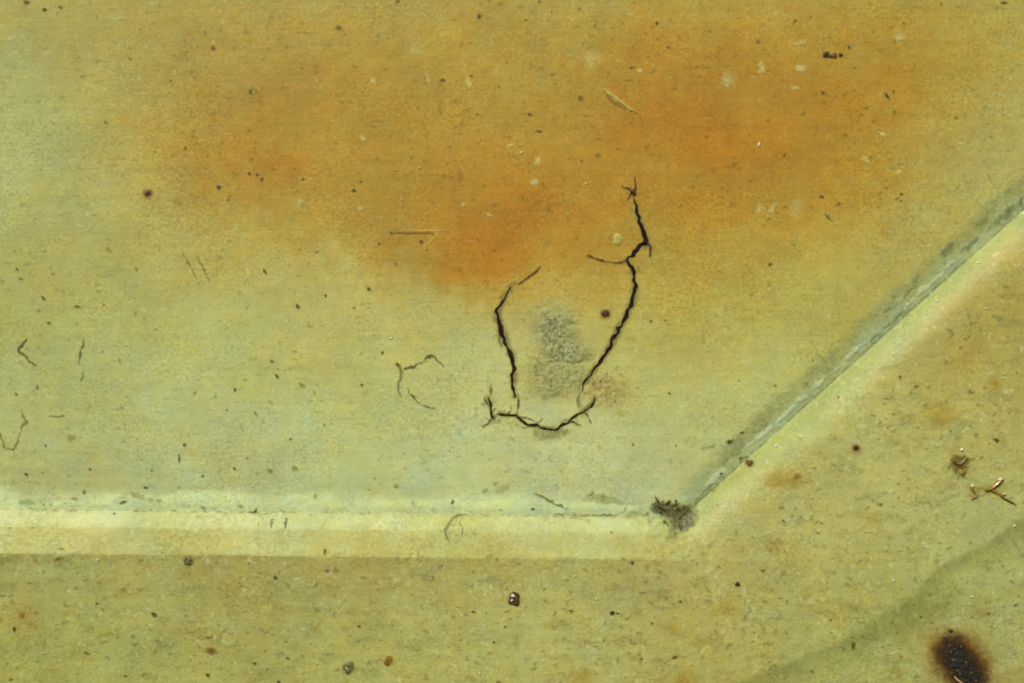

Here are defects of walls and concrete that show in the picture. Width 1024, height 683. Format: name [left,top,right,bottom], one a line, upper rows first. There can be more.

corrosion [163,9,939,292]
crack [481,177,652,438]